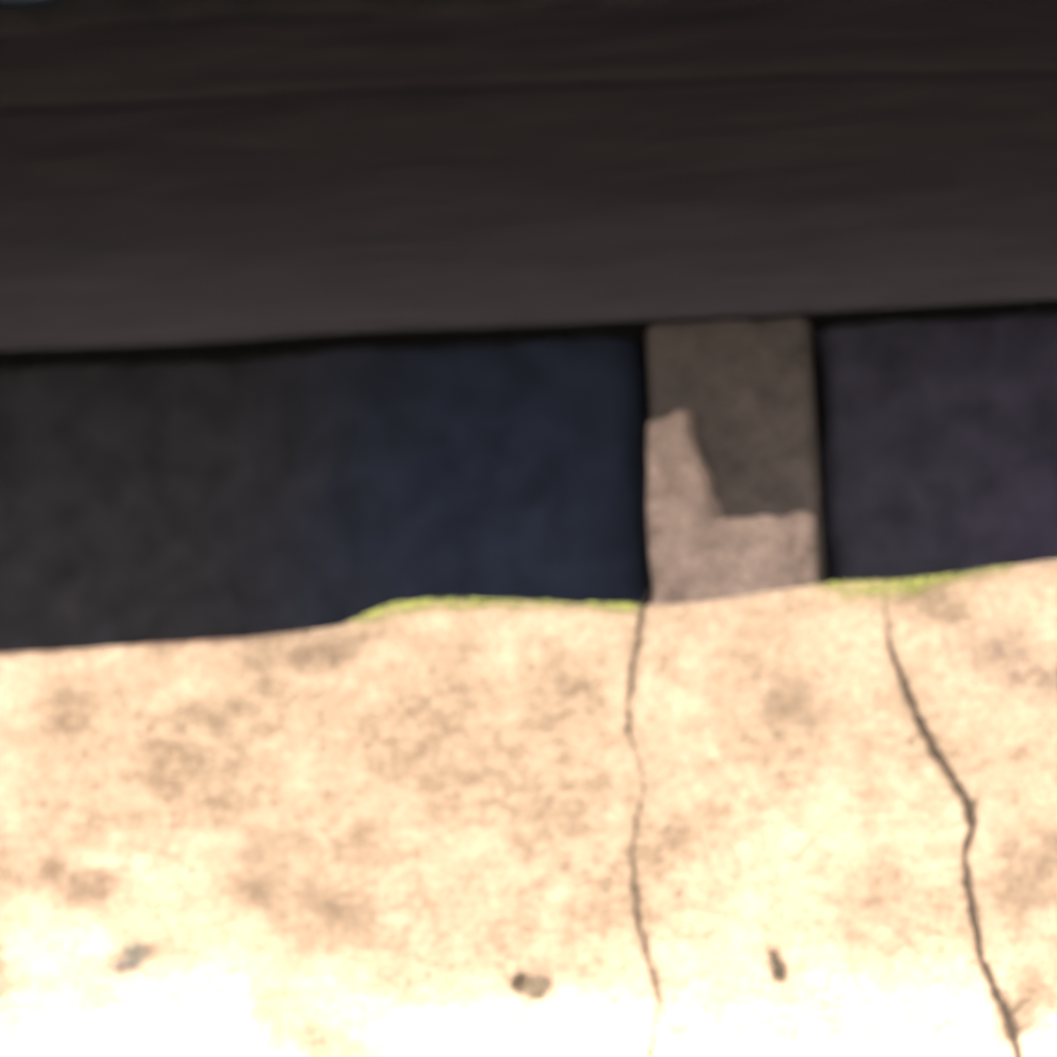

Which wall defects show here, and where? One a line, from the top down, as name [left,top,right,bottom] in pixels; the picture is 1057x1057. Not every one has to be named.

crack [627,592,648,754]
crack [631,786,659,1057]
crack [885,610,1027,1057]